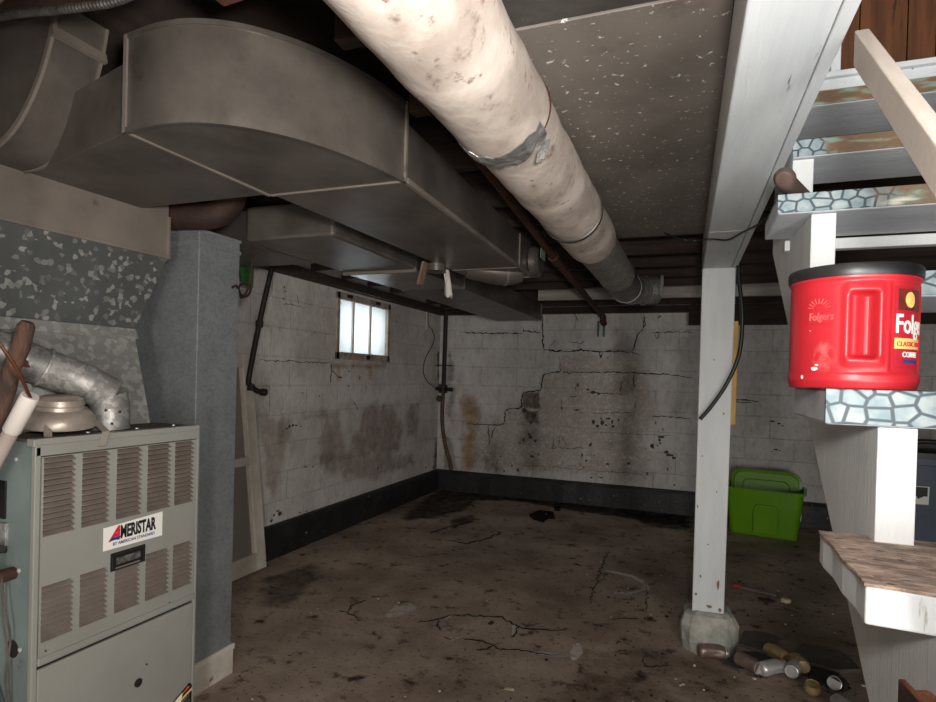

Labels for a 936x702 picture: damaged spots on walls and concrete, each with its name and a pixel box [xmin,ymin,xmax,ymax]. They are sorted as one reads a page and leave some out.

crack [463,314,693,475]
crack [431,504,501,544]
damp [404,490,690,529]
crack [418,614,569,656]